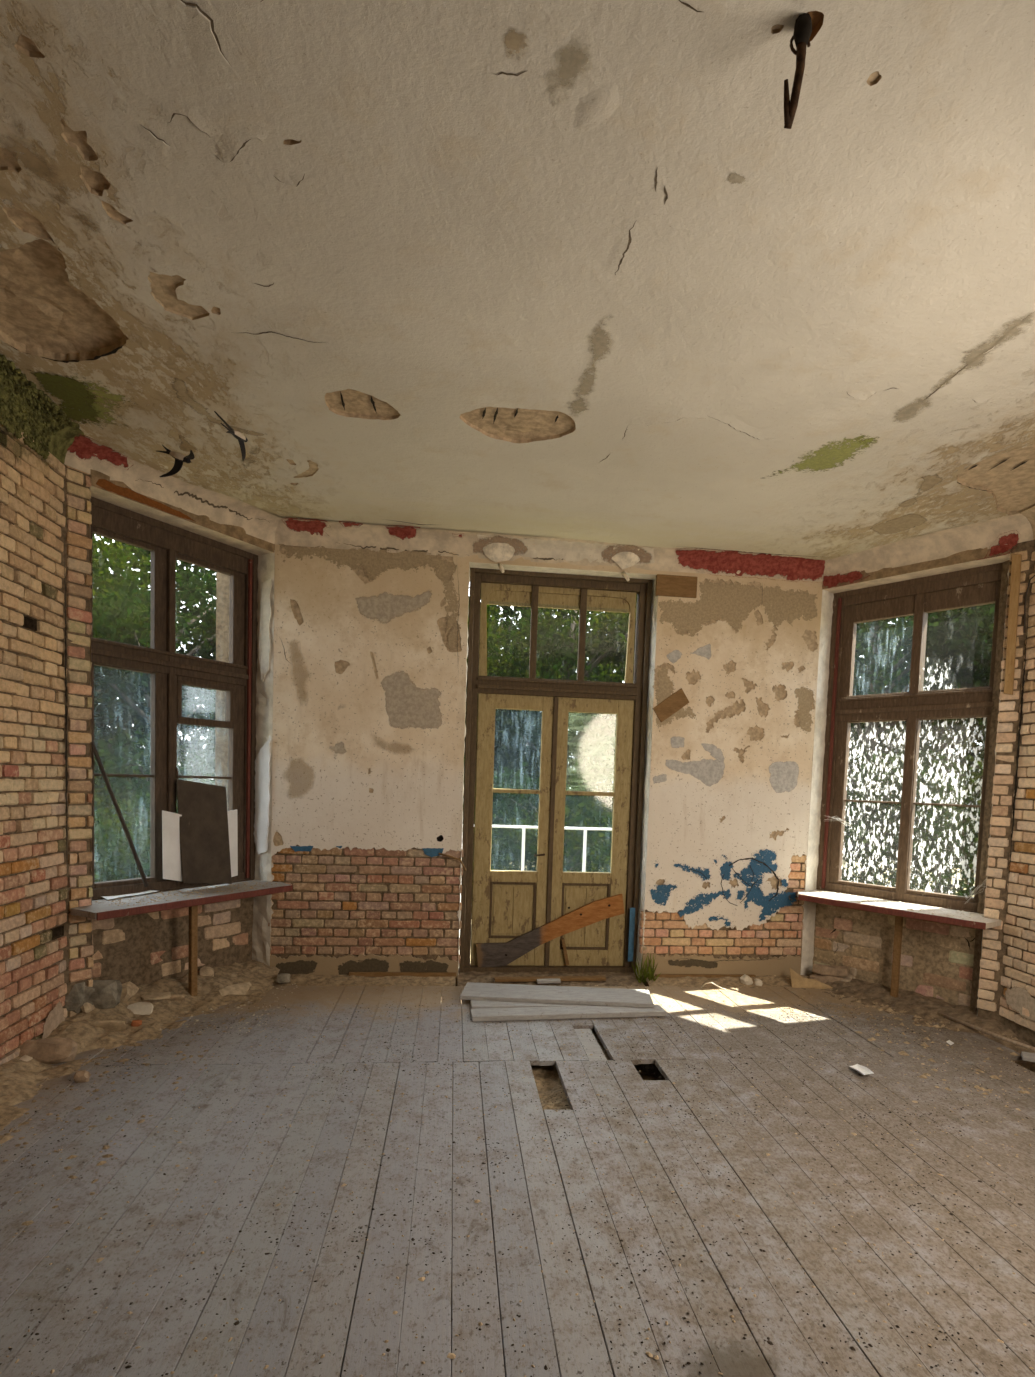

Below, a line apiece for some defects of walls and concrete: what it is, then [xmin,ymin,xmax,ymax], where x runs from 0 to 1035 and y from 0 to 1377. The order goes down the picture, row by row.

crack [149,0,232,71]
spalling [61,119,133,225]
spalling [0,207,129,363]
peeling [66,434,134,469]
spalling [871,445,1035,560]
spalling [22,615,37,631]
flaking render [258,580,272,681]
peeling [279,518,462,654]
peeling [653,549,870,786]
peeling [769,761,799,793]
spalling [254,735,463,964]
spalling [639,828,807,961]